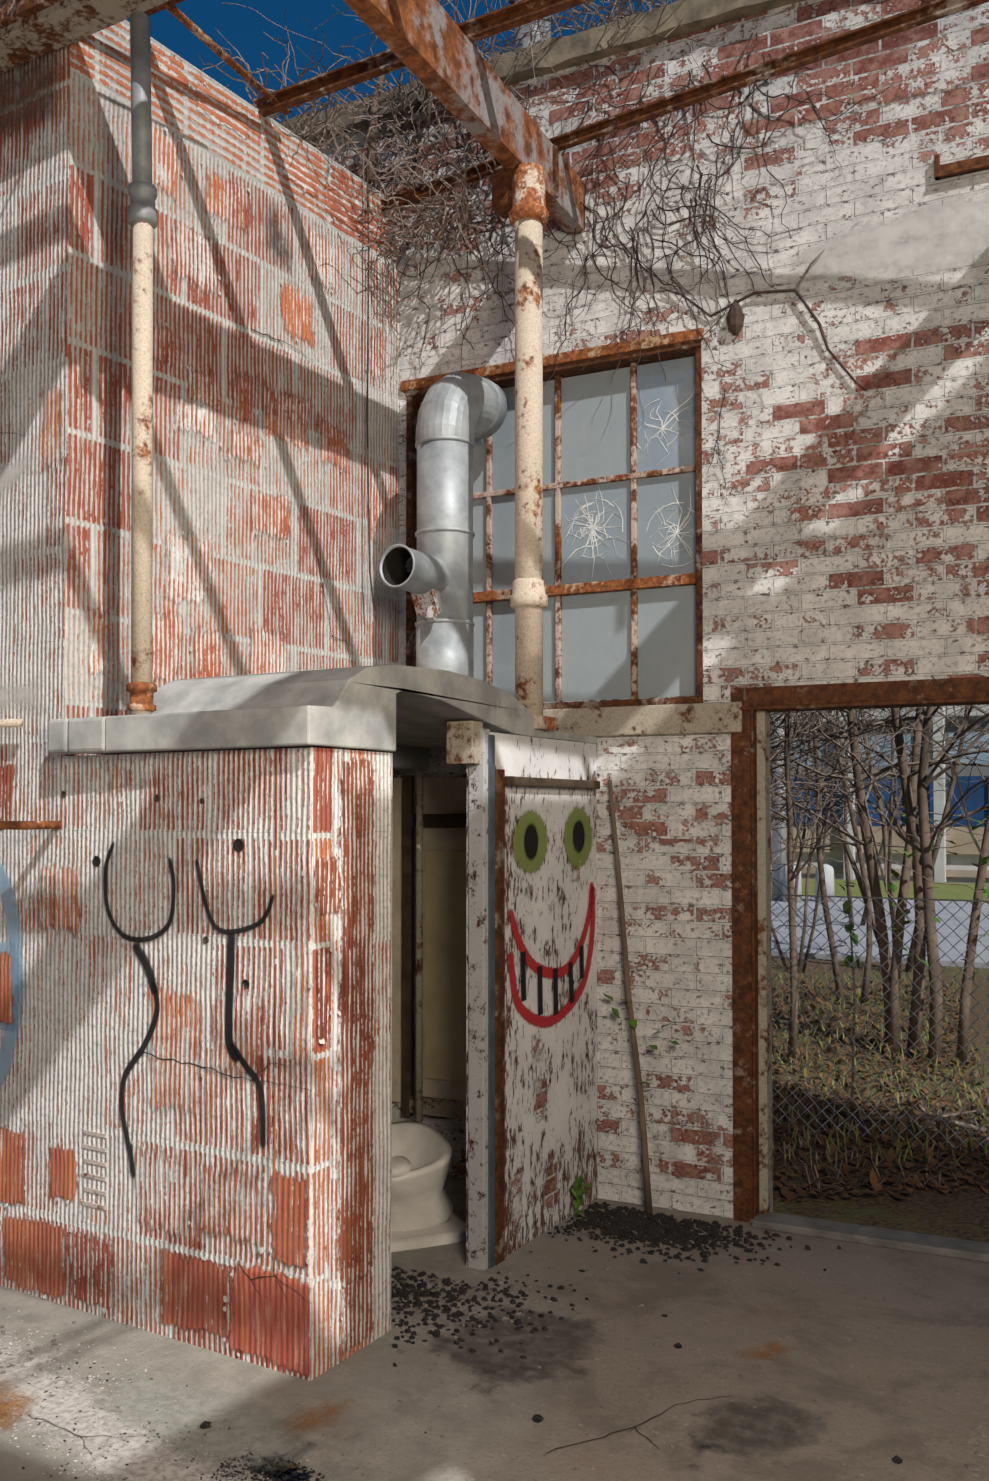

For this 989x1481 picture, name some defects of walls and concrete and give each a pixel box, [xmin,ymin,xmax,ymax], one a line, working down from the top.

flaking render [631,2,989,209]
peeling [153,323,349,473]
flaking render [714,327,915,556]
flaking render [890,437,989,515]
peeling [102,518,117,587]
peeling [250,489,291,543]
peeling [87,607,114,679]
peeling [152,528,227,683]
peeling [246,621,287,674]
flaking render [531,1036,549,1123]
flaking render [653,1123,722,1180]
crack [547,1395,731,1453]